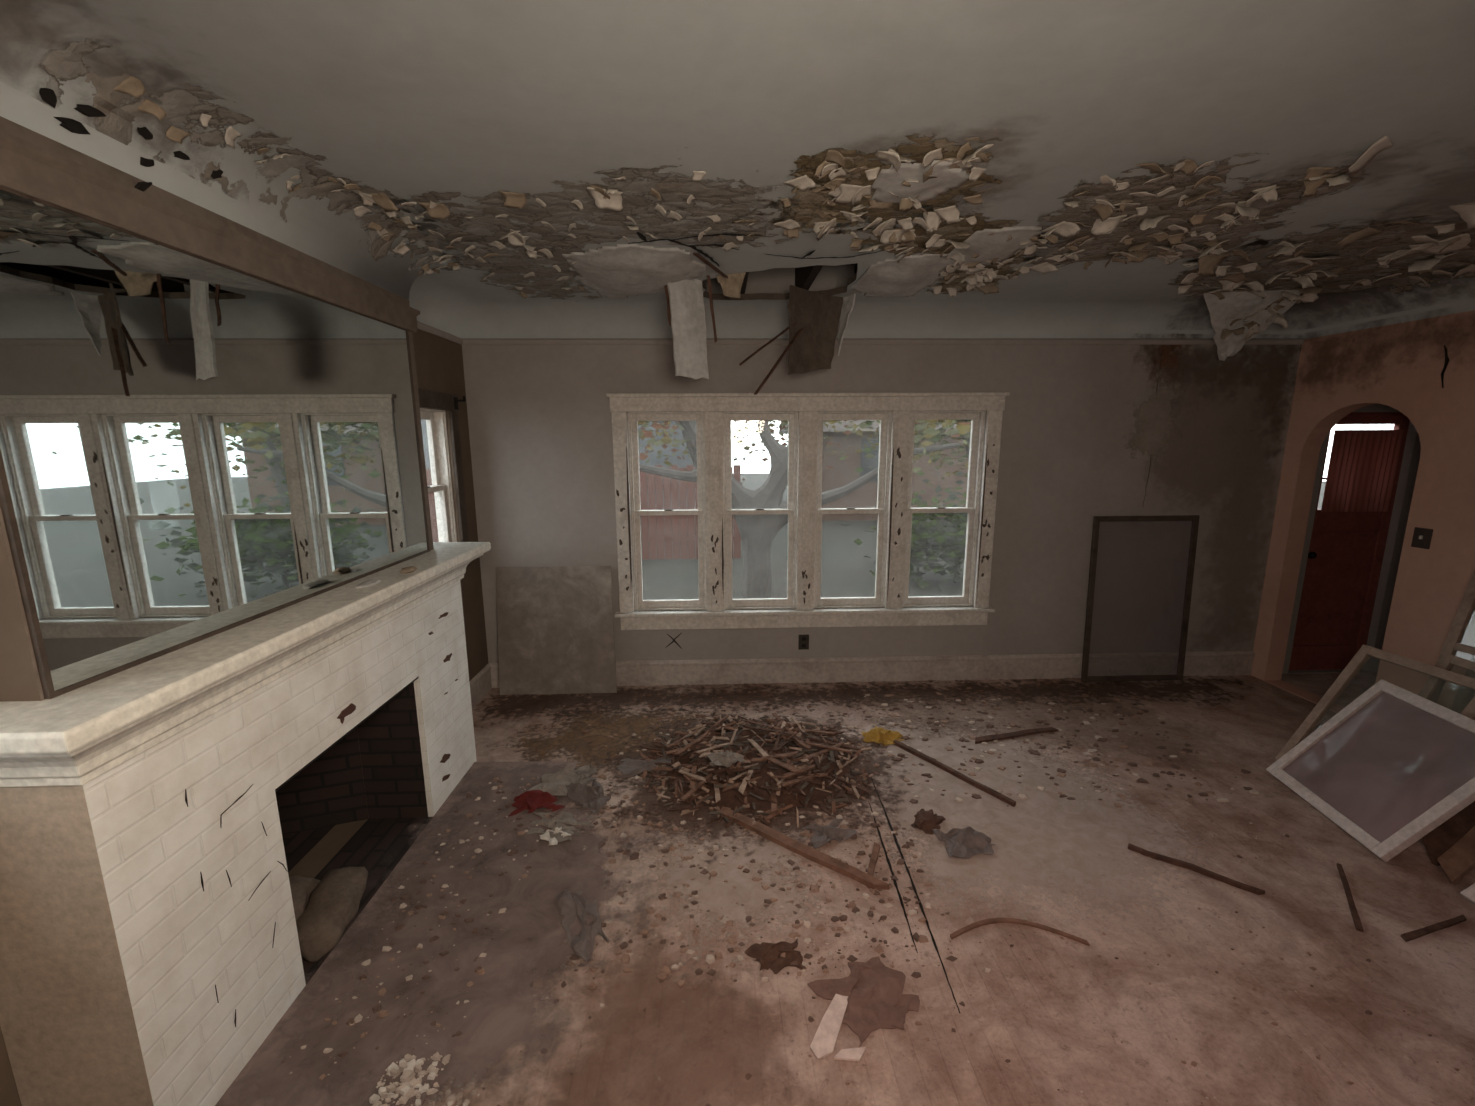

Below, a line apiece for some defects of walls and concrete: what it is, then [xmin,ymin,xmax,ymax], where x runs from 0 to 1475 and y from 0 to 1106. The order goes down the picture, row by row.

peeling [39,39,1475,395]